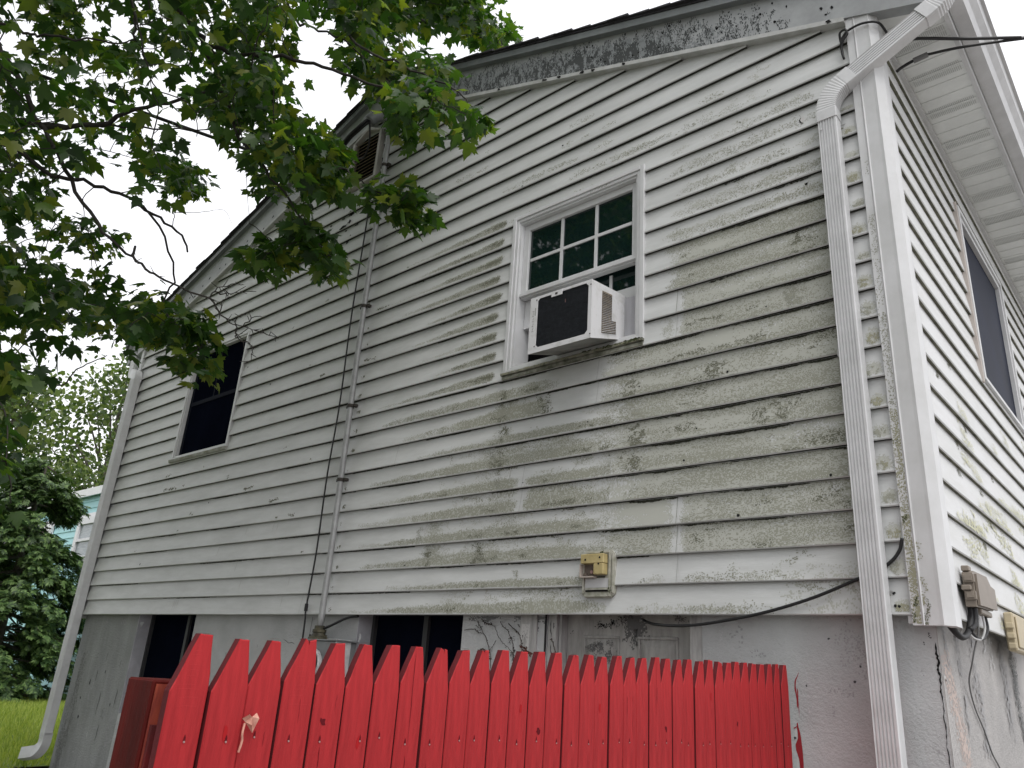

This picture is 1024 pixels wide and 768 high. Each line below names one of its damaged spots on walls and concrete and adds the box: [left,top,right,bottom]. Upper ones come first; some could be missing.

mould [449,4,790,97]
water stain [664,329,766,406]
water stain [613,379,649,472]
mould [852,214,931,625]
crack [935,643,951,768]